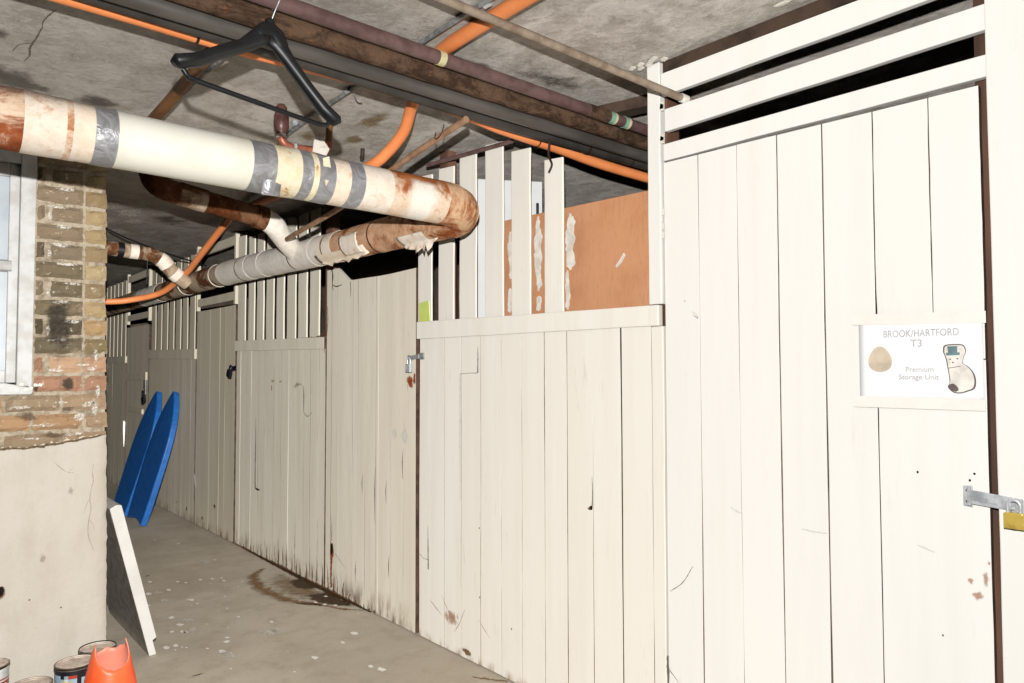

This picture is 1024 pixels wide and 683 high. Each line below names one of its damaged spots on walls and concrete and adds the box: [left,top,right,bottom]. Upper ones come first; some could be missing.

crack [13,9,57,61]
water stain [232,542,376,614]